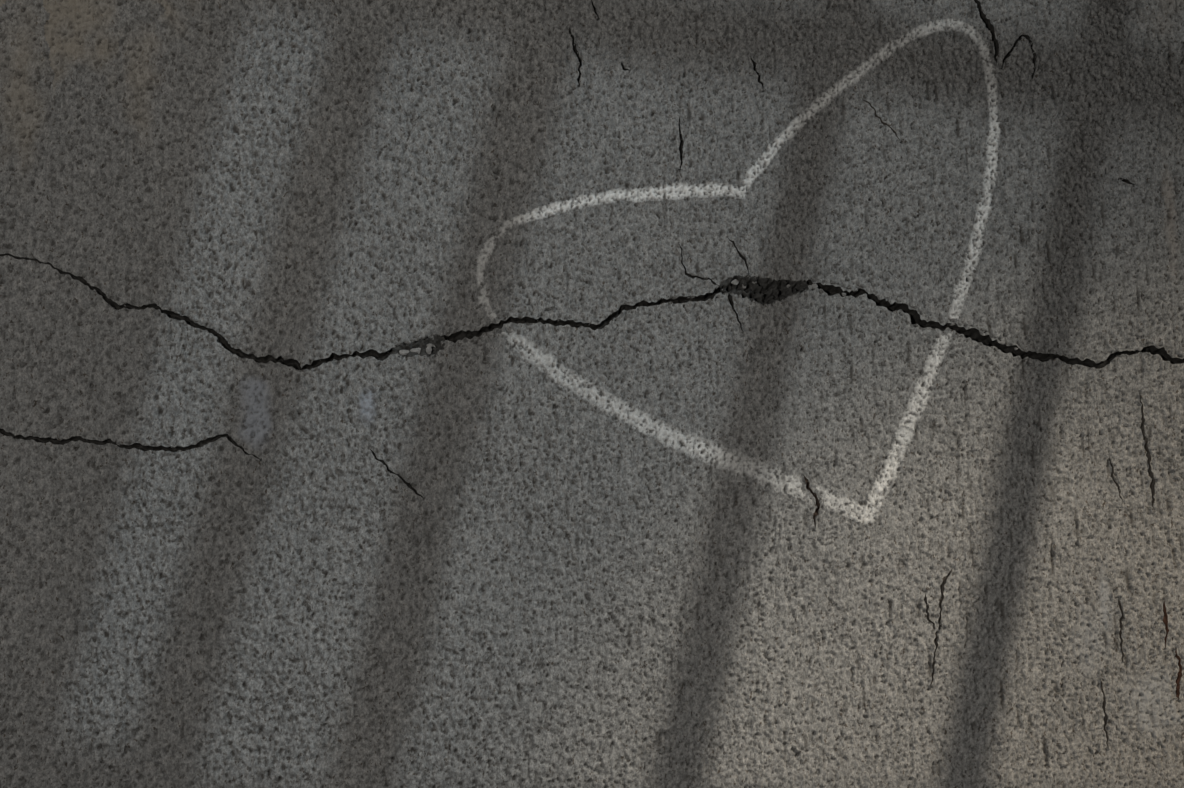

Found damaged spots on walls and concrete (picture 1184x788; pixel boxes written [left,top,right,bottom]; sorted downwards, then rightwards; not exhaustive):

crack [974,0,1037,75]
crack [0,238,1184,370]
crack [0,428,261,460]